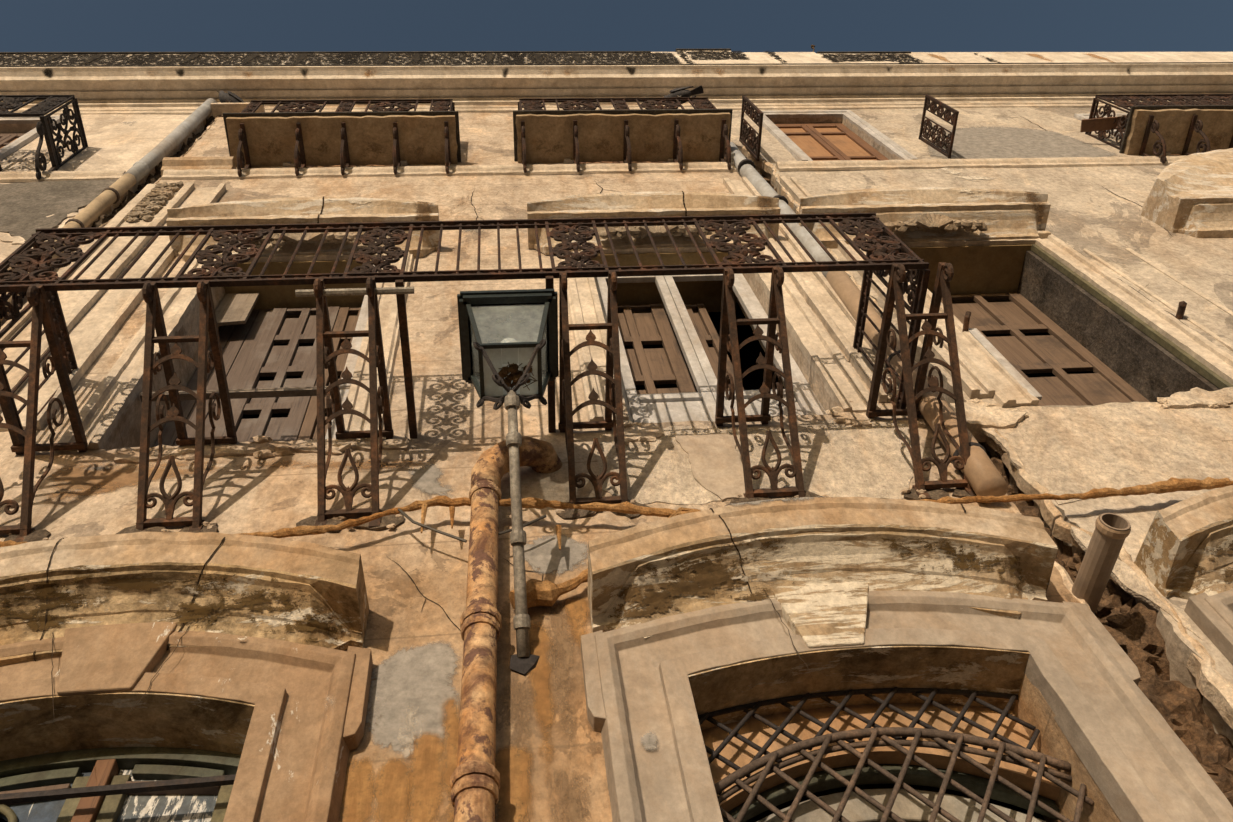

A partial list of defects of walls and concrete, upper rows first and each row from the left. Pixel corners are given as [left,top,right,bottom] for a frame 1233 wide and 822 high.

crack [33,538,64,733]
damp [0,570,343,642]
crack [122,537,236,722]
corrosion [495,597,588,822]
crack [709,508,812,677]
damp [881,537,1036,594]
crack [978,428,1233,807]